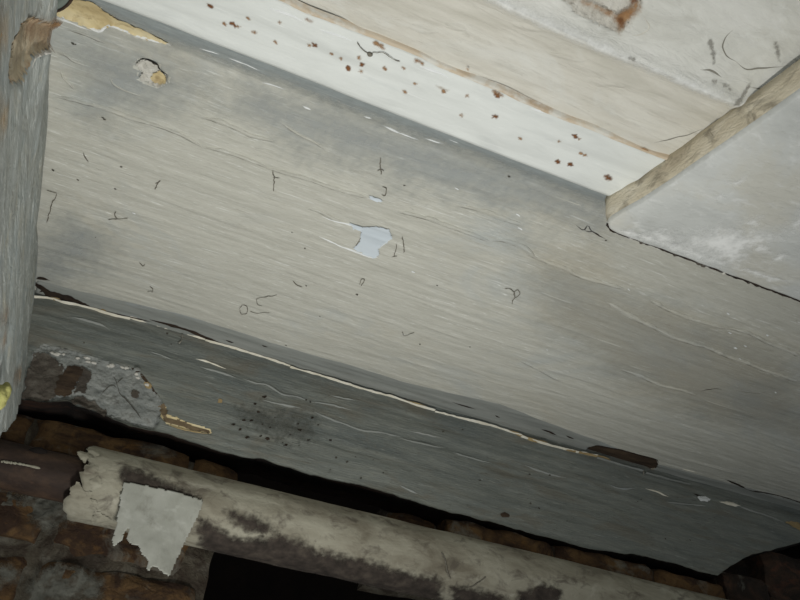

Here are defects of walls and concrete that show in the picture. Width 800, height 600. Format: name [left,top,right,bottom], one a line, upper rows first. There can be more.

flaking render [8,0,168,88]
corrosion [586,0,641,30]
peeling [321,217,392,259]
crack [395,210,799,382]
flaking render [21,344,212,434]
crack [34,277,800,531]
peeling [70,447,102,498]
peeling [91,511,110,526]